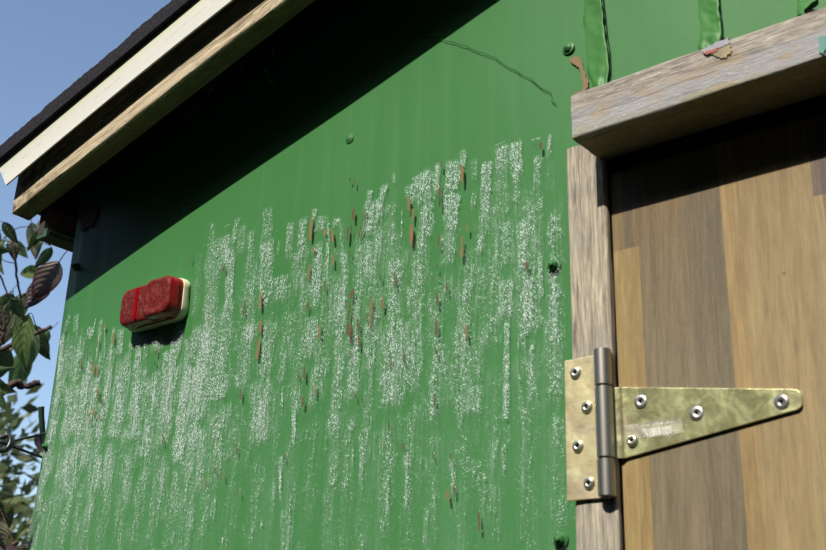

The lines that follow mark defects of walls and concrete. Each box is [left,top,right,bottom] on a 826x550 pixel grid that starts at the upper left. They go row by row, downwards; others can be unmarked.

crack [371,35,557,105]
peeling [570,56,589,95]